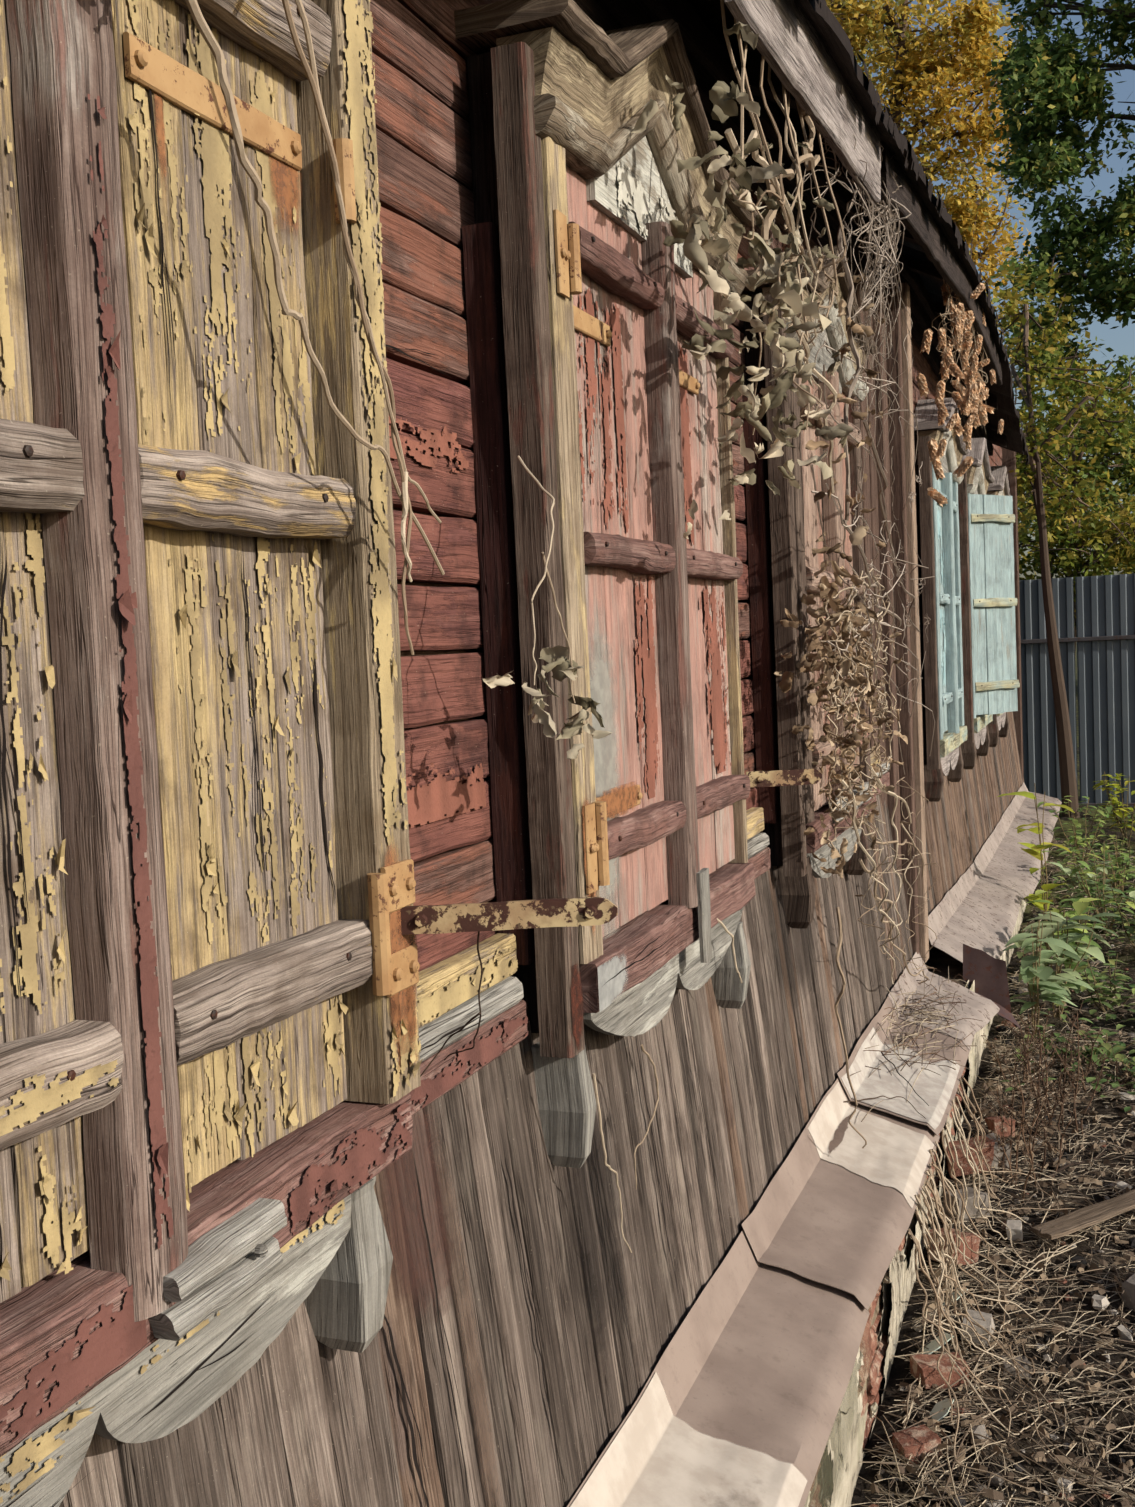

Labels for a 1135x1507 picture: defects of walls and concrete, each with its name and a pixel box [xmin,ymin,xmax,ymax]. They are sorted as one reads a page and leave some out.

corrosion [155,95,166,175]
corrosion [271,157,299,228]
peeling [129,81,252,452]
peeling [343,0,486,846]
peeling [0,512,68,1032]
peeling [93,215,299,1249]
peeling [169,537,333,944]
corrosion [582,781,638,872]
corrosion [389,909,417,954]
corrosion [391,985,417,1056]
peeling [38,1146,88,1274]
leakage [570,1372,808,1507]